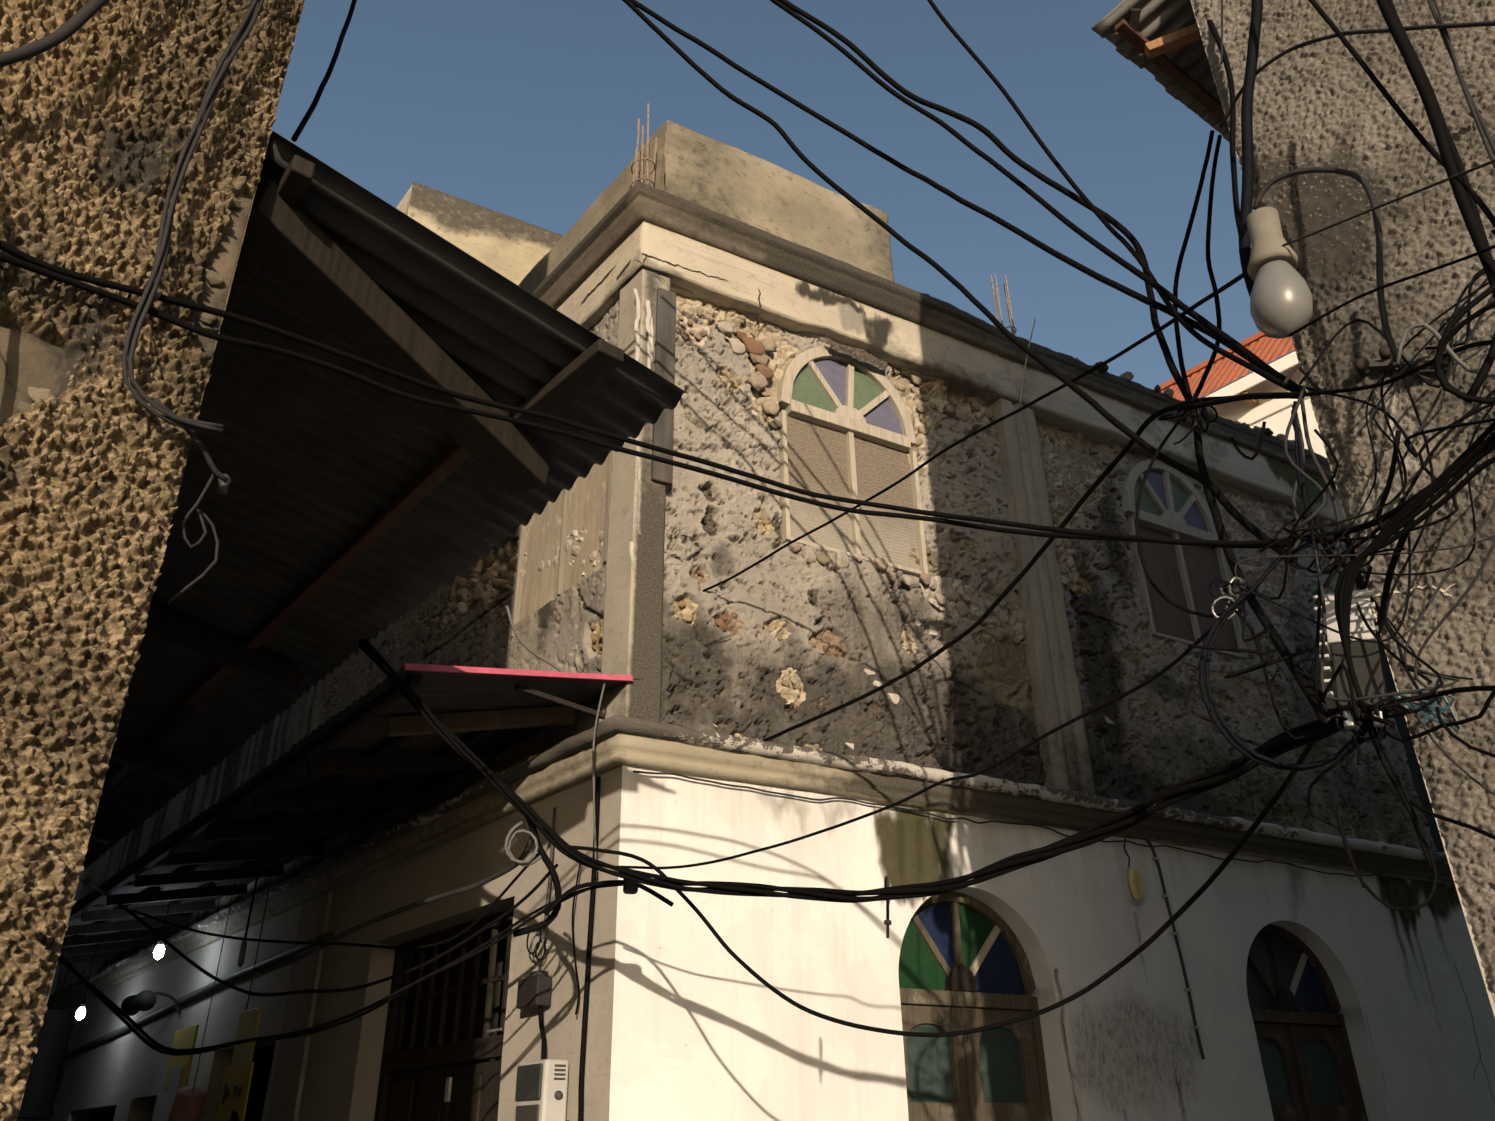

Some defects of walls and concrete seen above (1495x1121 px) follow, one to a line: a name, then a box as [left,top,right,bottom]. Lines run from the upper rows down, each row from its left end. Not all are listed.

water stain [101,120,180,193]
spalling [0,326,68,423]
spalling [675,294,799,431]
water stain [796,280,891,349]
spalling [823,337,995,483]
spalling [906,547,1027,650]
peeling [781,676,802,691]
flaking render [863,669,900,720]
water stain [874,805,953,905]
water stain [1376,875,1462,952]